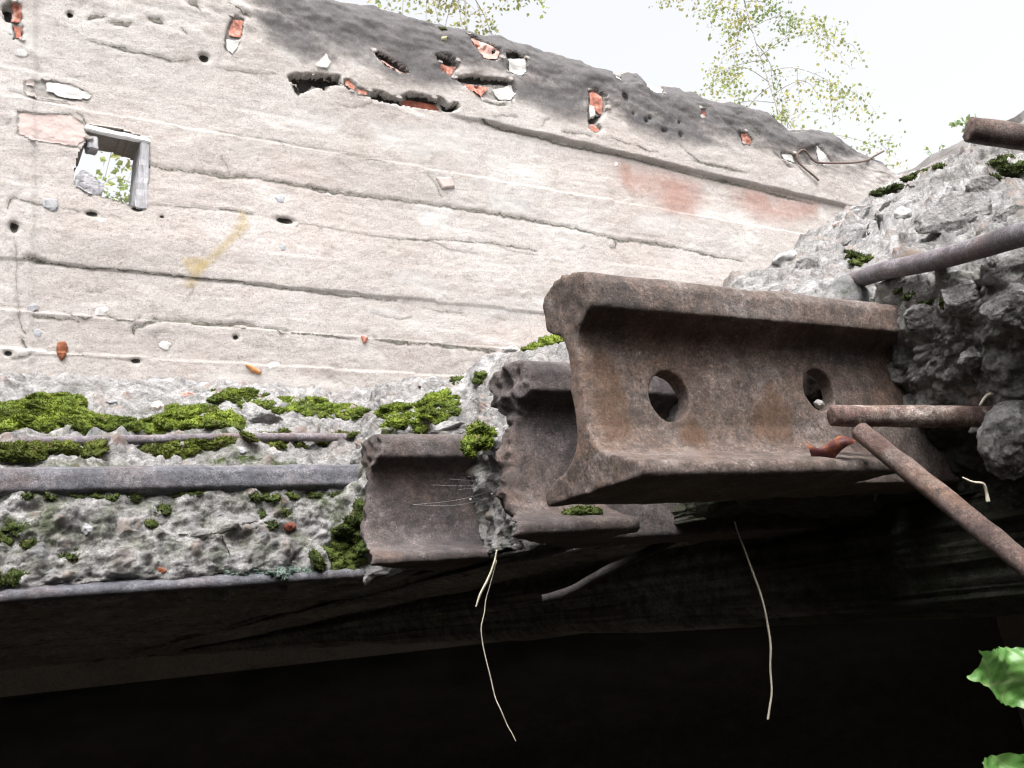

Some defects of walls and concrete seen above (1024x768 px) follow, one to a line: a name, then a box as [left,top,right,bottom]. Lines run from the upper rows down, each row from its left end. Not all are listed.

spalling [1,0,25,42]
spalling [16,76,93,148]
spalling [286,54,459,112]
spalling [369,47,408,74]
spalling [436,32,530,101]
leakage [261,0,885,165]
spalling [587,88,611,133]
spalling [780,143,831,165]
spalling [838,221,1024,286]